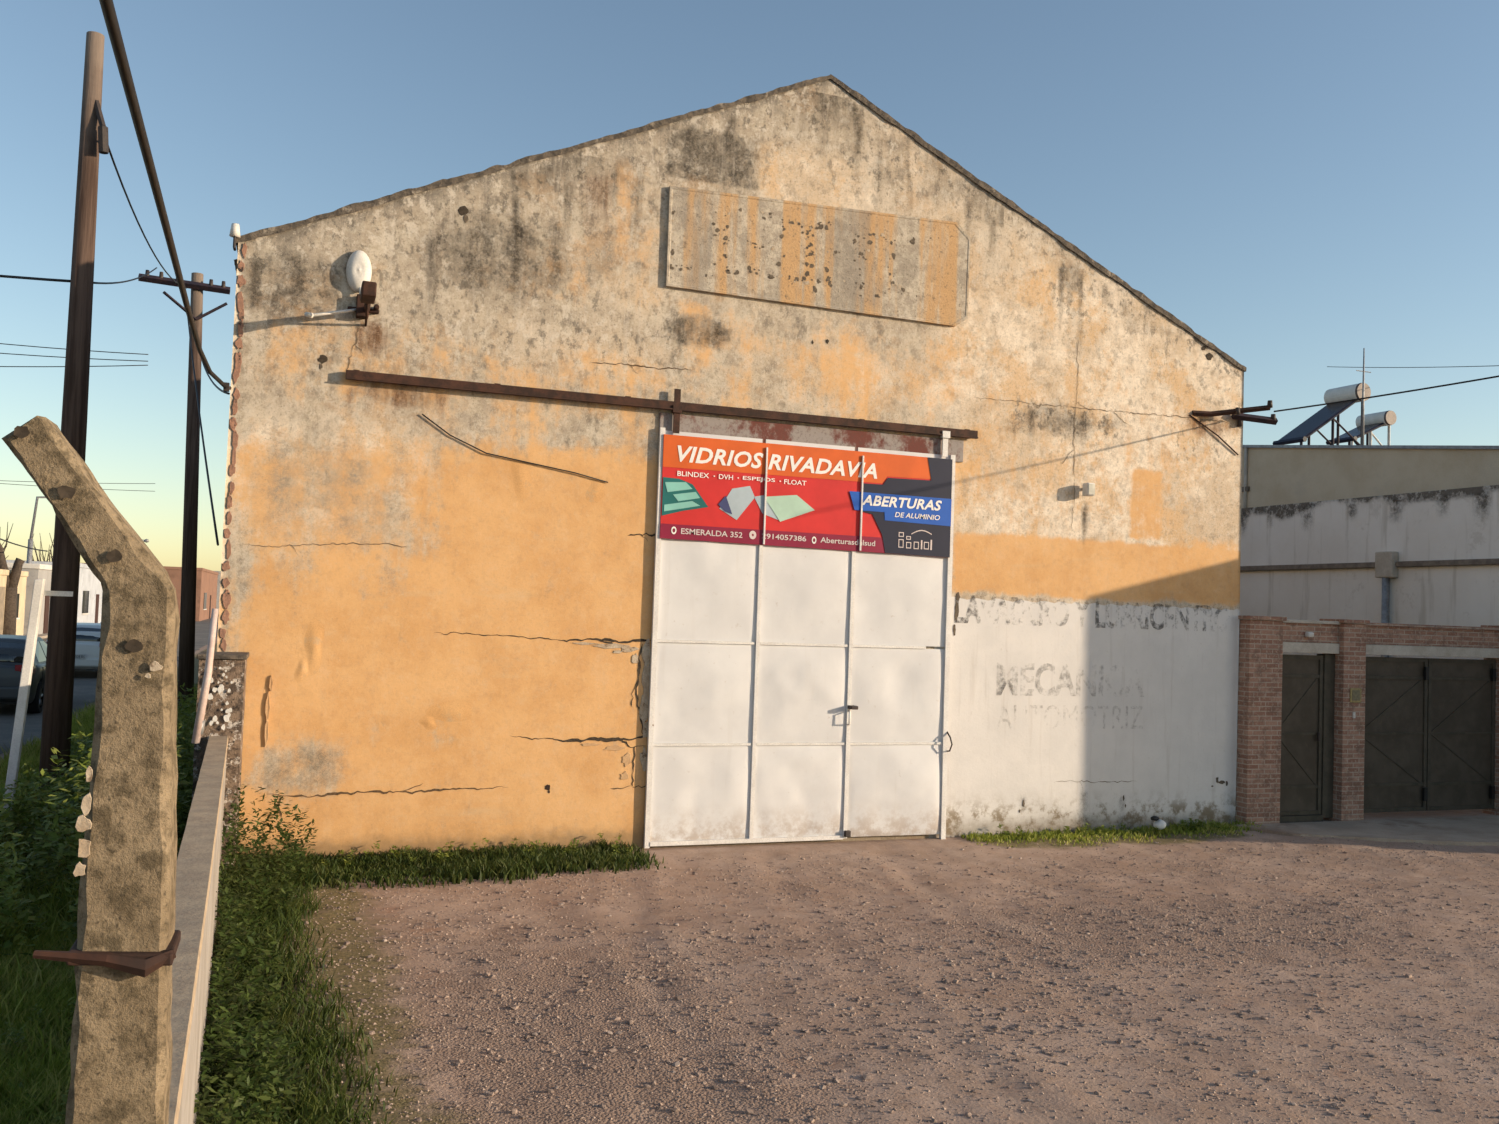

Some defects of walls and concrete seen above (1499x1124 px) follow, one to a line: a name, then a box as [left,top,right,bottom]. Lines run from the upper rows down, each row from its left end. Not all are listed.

crack [434,632,646,789]
crack [275,784,502,817]